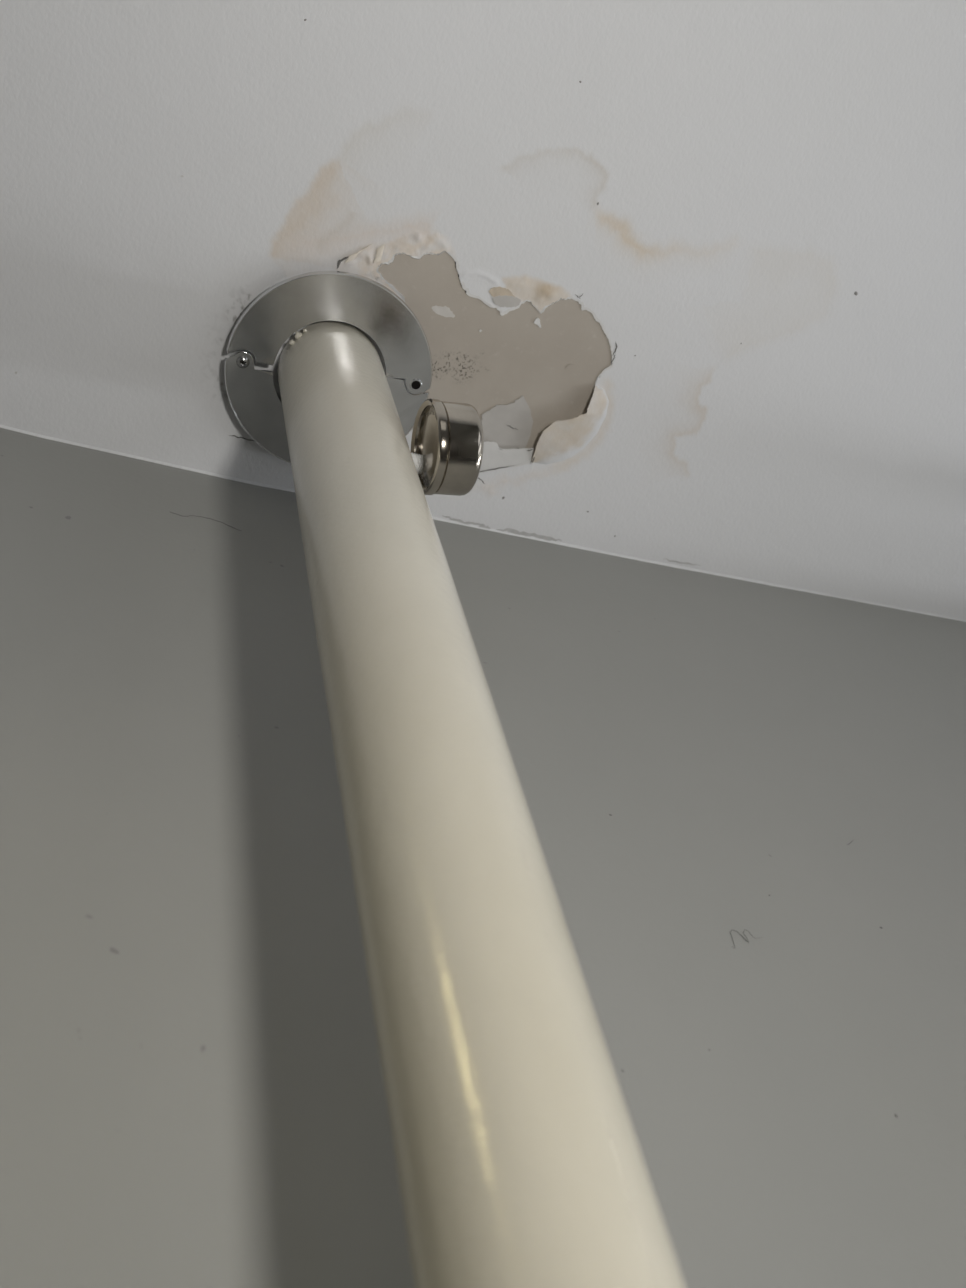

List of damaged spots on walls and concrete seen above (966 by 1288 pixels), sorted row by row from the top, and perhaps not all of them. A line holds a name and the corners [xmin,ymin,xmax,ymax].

damp [264,153,443,280]
peeling [376,251,617,484]